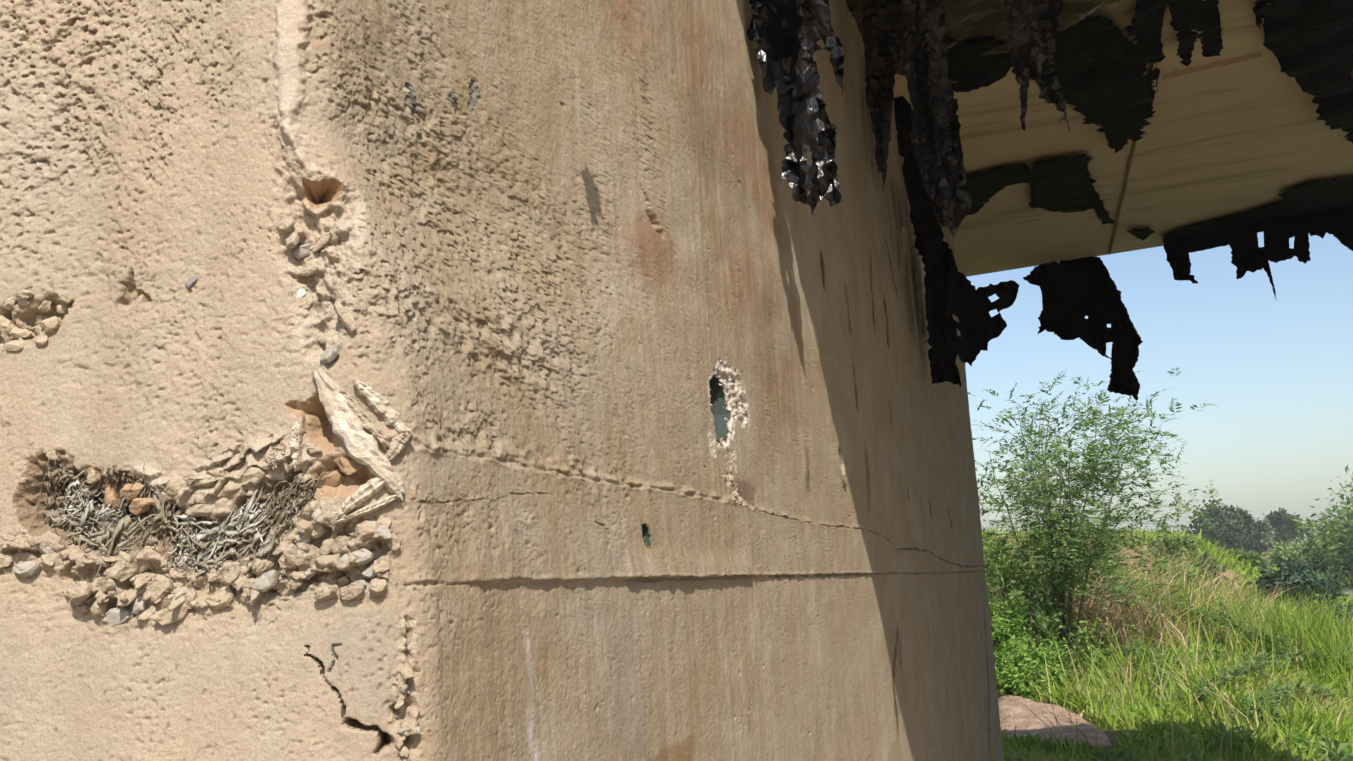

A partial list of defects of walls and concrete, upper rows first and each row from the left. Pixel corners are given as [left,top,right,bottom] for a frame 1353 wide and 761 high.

spalling [0,0,414,626]
spalling [707,358,750,449]
crack [411,491,553,507]
crack [624,502,985,583]
crack [304,643,393,755]
spalling [382,614,423,761]